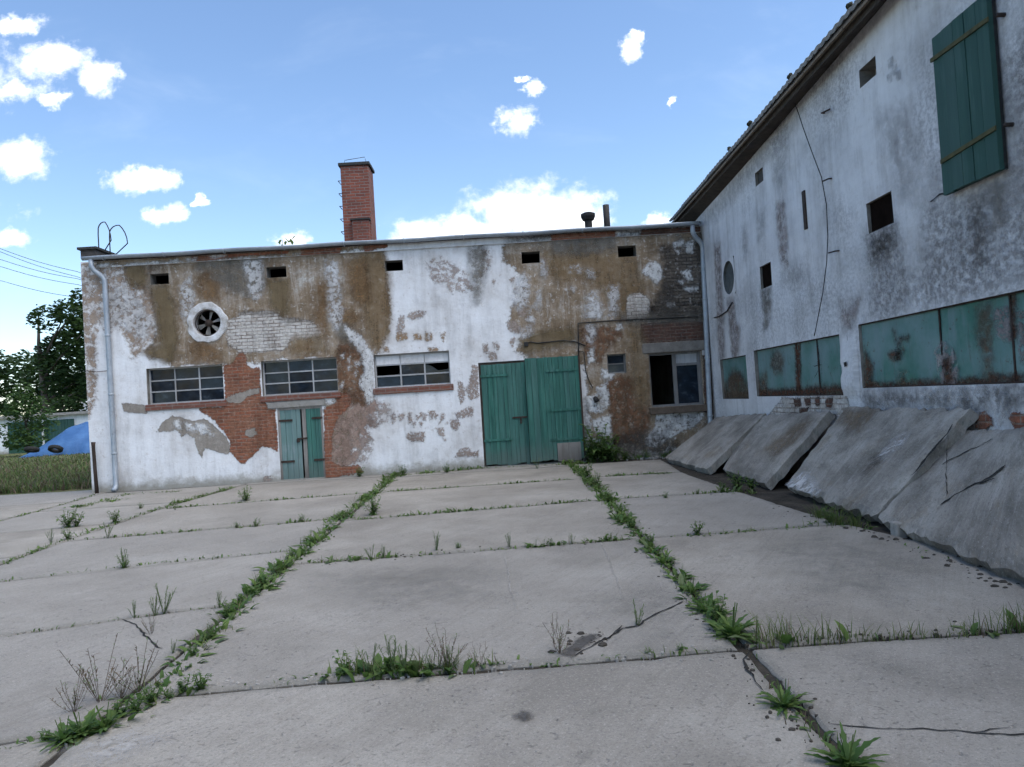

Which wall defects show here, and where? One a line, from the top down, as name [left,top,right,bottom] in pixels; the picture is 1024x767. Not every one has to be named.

damp [108,265,195,361]
flaking render [81,244,479,478]
damp [291,261,369,354]
damp [469,245,485,298]
flaking render [481,227,724,452]
damp [762,289,770,326]
rust [724,343,843,398]
damp [870,232,902,314]
rust [864,294,1024,387]
damp [921,187,1024,300]
crack [912,424,1005,505]